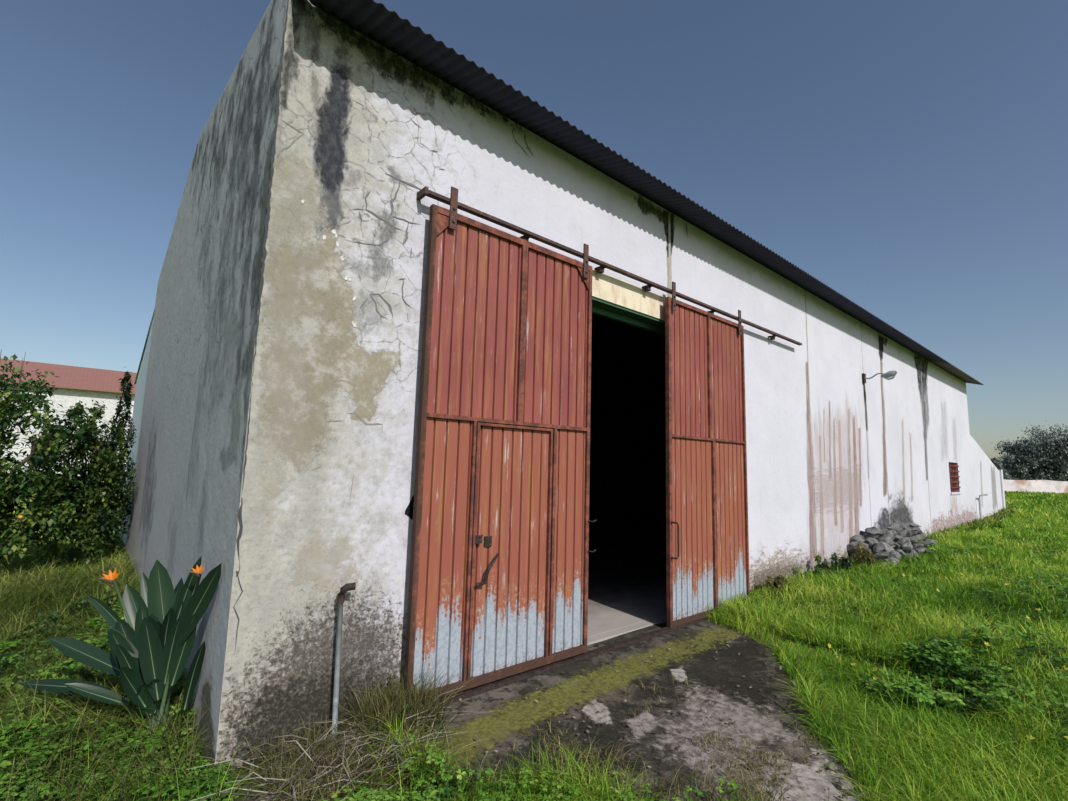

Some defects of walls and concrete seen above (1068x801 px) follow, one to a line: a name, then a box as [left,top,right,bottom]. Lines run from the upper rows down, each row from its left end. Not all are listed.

crack [512,126,534,158]
peeling [253,156,401,471]
water stain [192,0,521,463]
crack [342,171,422,329]
corrosion [807,397,816,559]
water stain [920,386,929,480]
water stain [217,592,408,769]